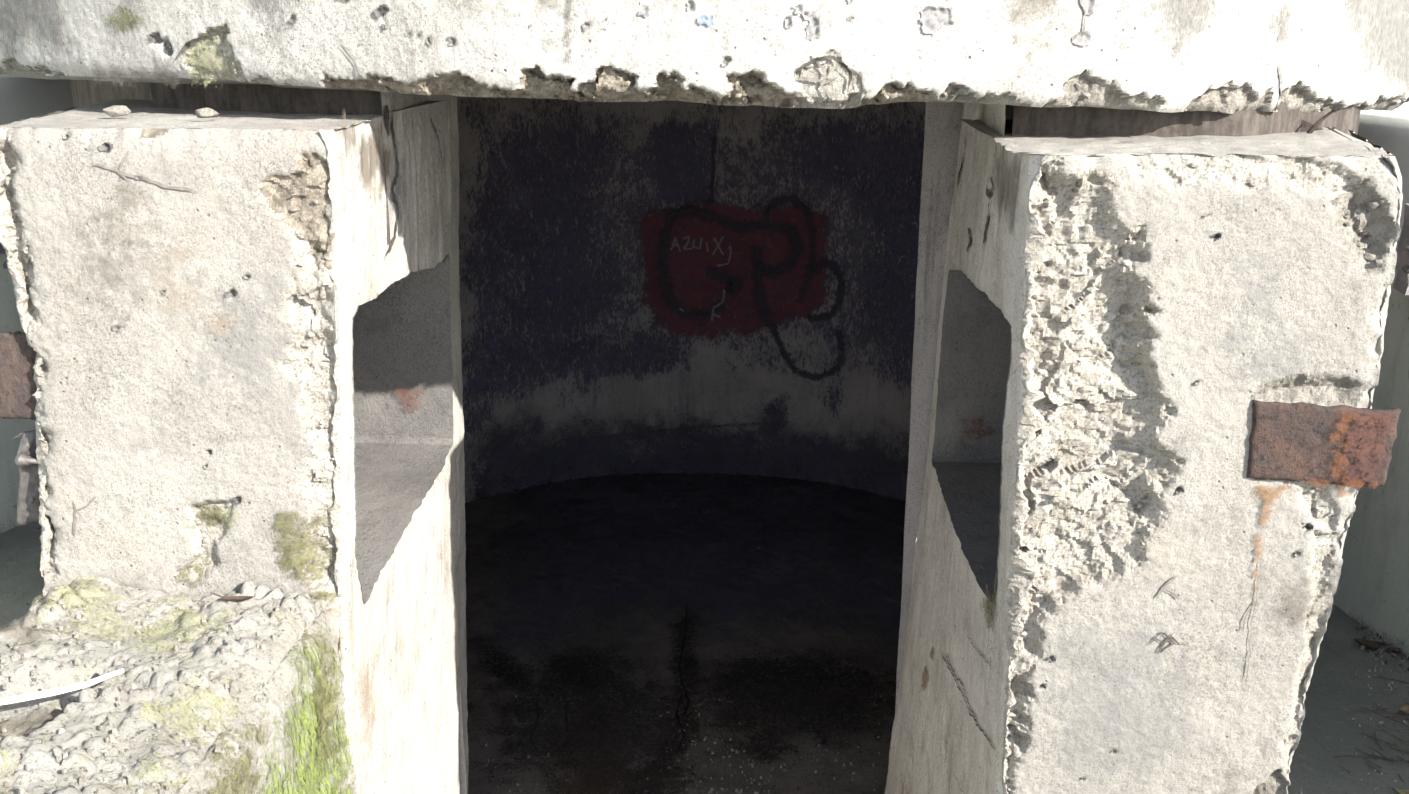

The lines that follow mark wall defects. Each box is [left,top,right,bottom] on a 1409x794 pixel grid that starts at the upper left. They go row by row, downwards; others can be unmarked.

spalling [320,0,1165,112]
spalling [1184,80,1409,114]
spalling [1127,154,1397,277]
spalling [0,127,60,583]
spalling [259,152,343,606]
spalling [1248,372,1367,408]
spalling [1004,154,1186,794]
corrosion [1337,411,1394,497]
corrosion [1253,485,1288,590]
leakage [467,473,906,794]
leakage [297,631,354,794]
crack [942,635,997,757]